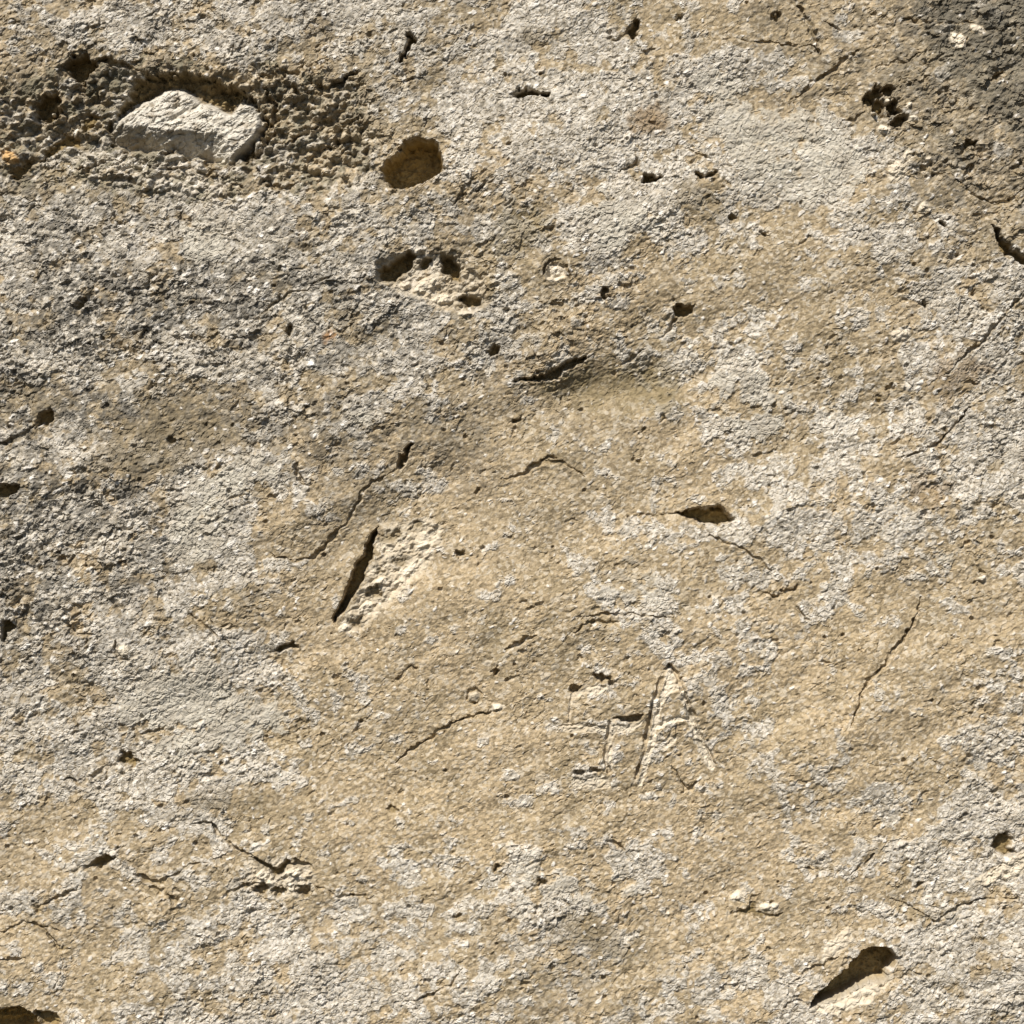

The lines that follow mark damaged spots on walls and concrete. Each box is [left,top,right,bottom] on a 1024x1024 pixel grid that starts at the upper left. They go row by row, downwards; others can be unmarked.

spalling [0,44,389,210]
crack [292,460,310,487]
crack [500,453,585,481]
crack [268,468,398,564]
crack [851,596,922,728]
crack [391,709,500,765]
spalling [820,925,858,964]
spalling [809,972,894,1017]